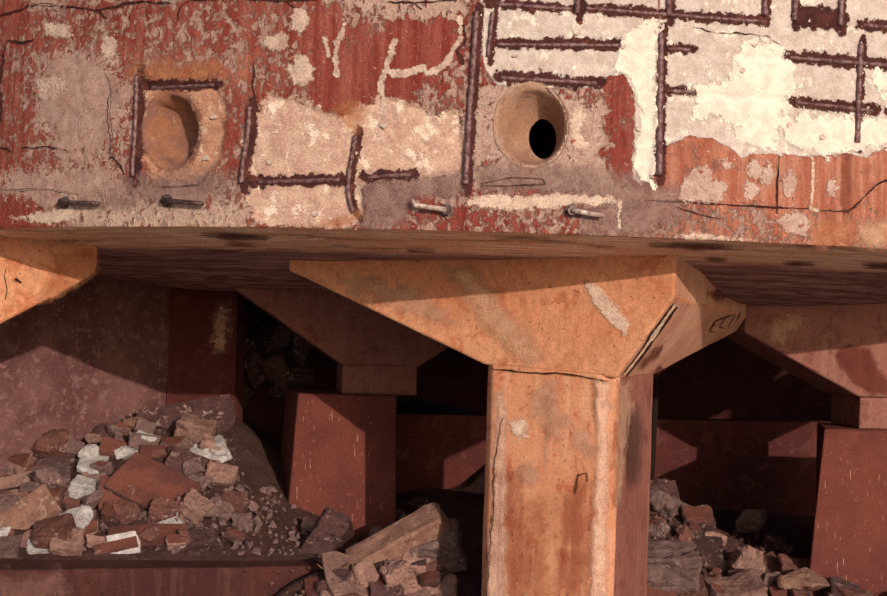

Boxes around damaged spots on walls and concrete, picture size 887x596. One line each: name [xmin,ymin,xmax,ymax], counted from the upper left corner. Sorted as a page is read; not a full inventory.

crack [0,39,34,122]
crack [0,0,202,20]
peeling [0,21,228,213]
crack [253,0,310,8]
spalling [201,8,466,247]
spalling [480,0,887,204]
crack [614,19,887,219]
peeling [776,210,811,237]
crack [491,304,678,382]
leakage [837,344,887,394]
leakage [487,392,536,596]
leakage [532,381,644,596]